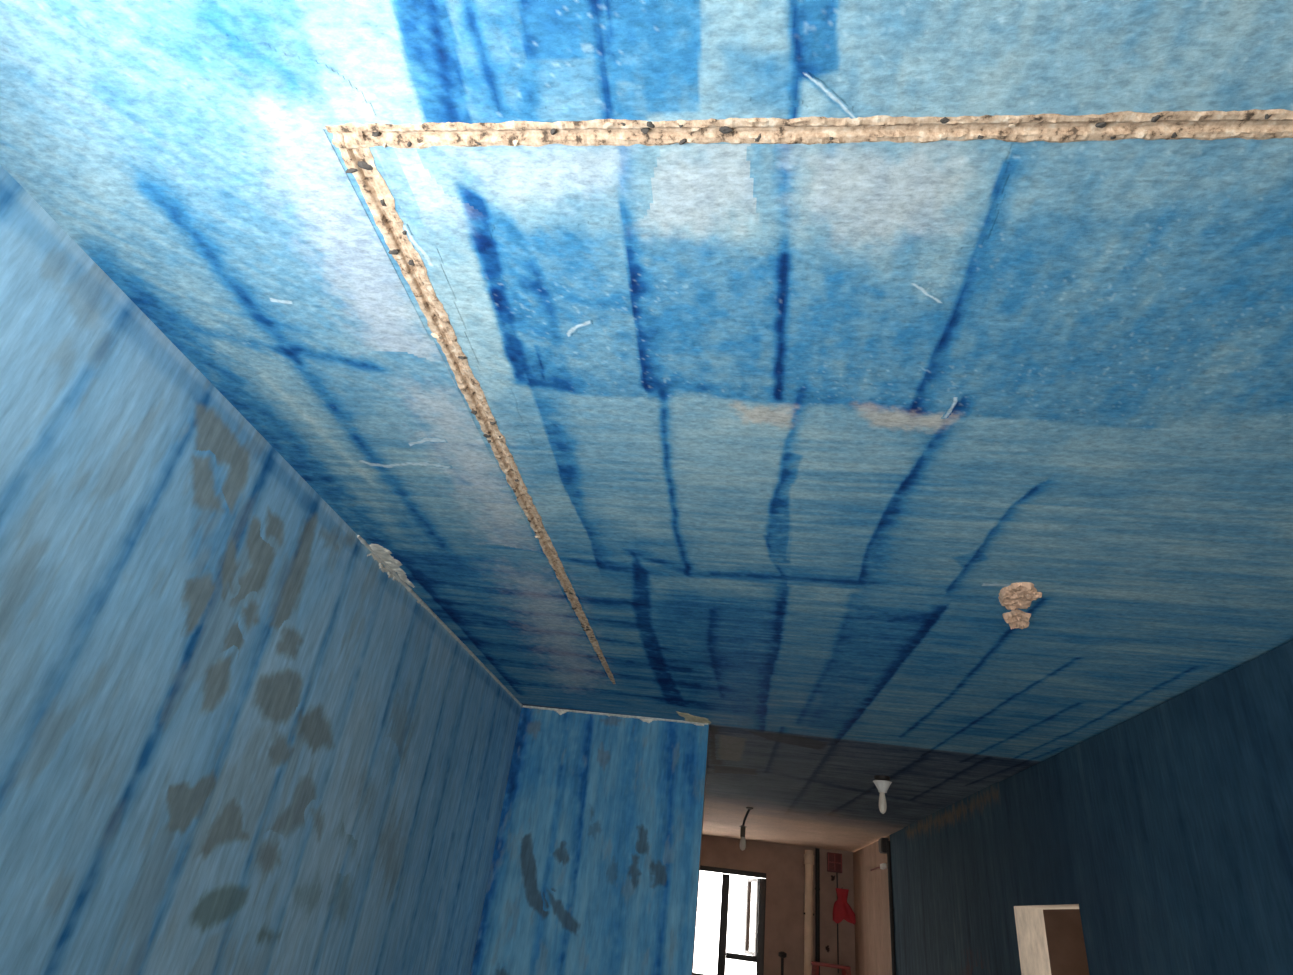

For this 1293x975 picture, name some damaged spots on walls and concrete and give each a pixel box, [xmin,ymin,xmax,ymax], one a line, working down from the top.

spalling [367,544,434,617]
spalling [998,582,1042,629]
flaking render [161,396,339,952]